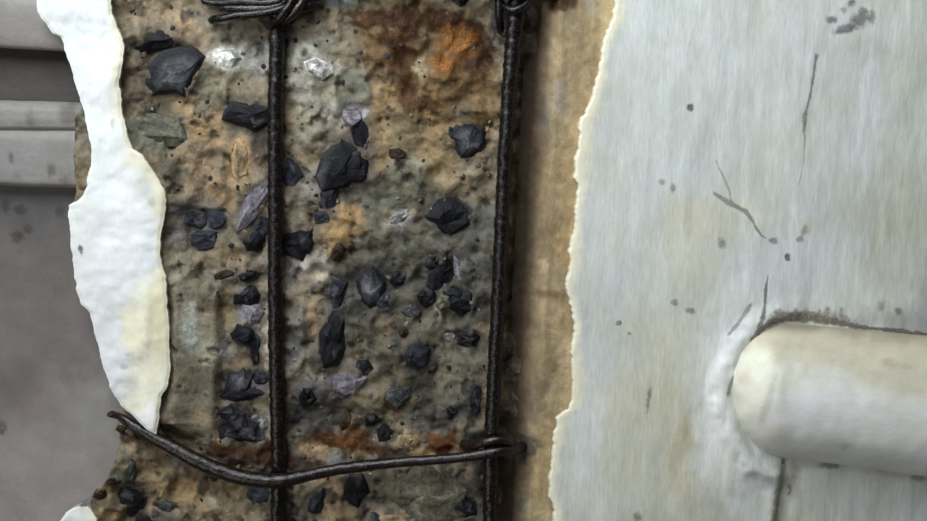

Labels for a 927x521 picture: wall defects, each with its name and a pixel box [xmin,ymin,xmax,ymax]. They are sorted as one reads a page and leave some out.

rust [351,4,493,113]
crack [803,55,818,143]
crack [714,161,765,237]
spalling [37,0,271,521]
spalling [282,0,508,521]
flaking render [497,0,614,521]
rust [210,440,271,465]
rust [315,425,391,455]
rust [427,433,455,454]
crack [772,459,791,521]